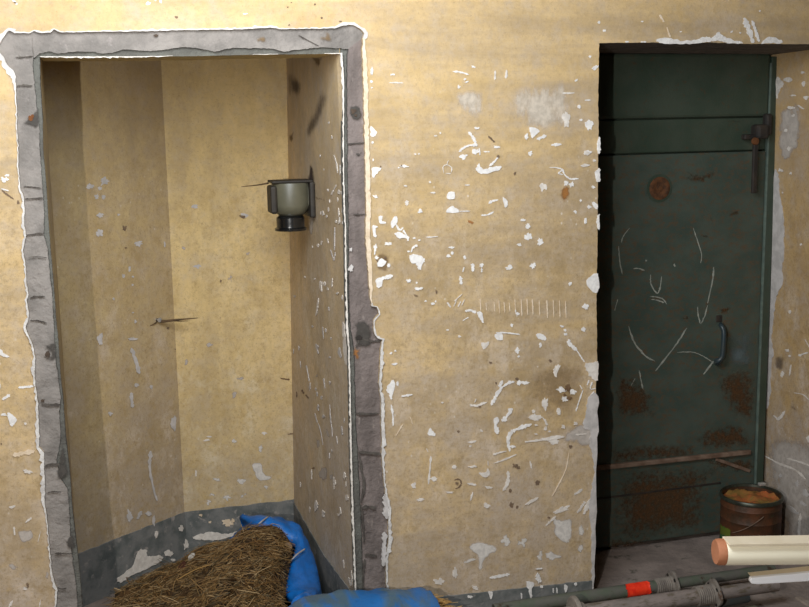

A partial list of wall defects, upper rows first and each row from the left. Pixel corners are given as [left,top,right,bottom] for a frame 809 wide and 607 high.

peeling [656,18,782,44]
peeling [776,71,809,159]
peeling [459,127,501,174]
peeling [446,191,469,213]
flaking render [0,22,425,607]
peeling [478,380,530,408]
peeling [494,386,577,451]
peeling [585,361,599,381]
flaking render [547,393,599,589]
peeling [769,441,809,535]
peeling [433,535,527,585]
peeling [521,551,561,599]